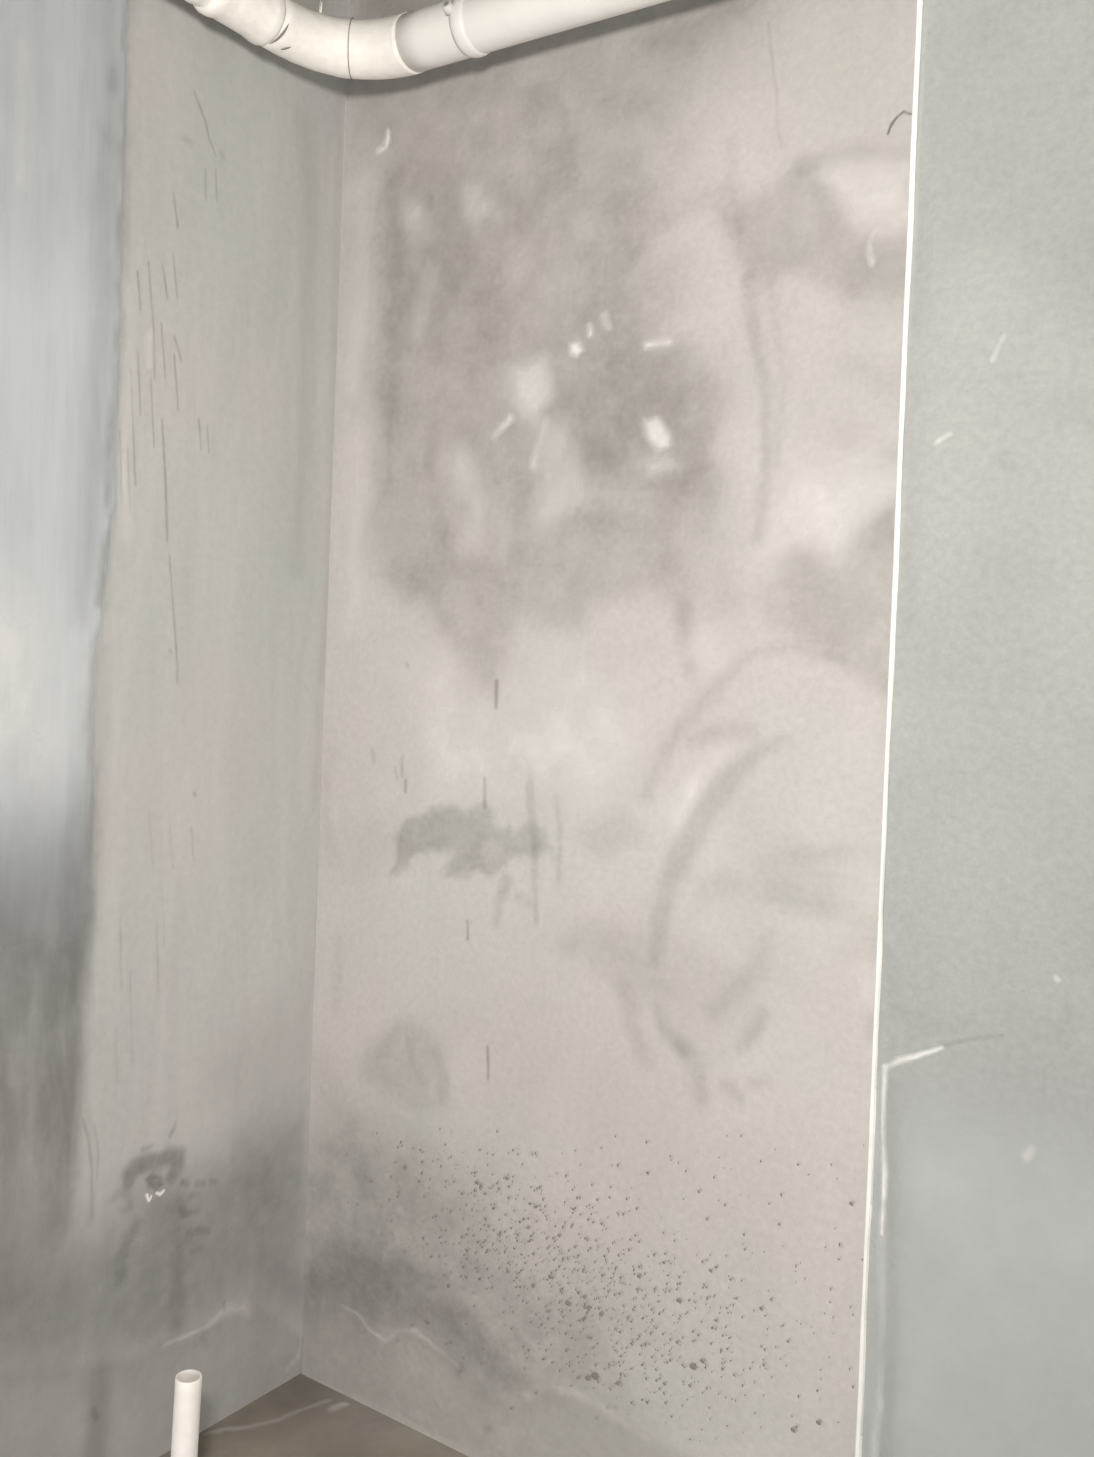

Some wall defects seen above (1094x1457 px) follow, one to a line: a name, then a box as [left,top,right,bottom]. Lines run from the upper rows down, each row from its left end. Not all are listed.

leakage [650,422,668,446]